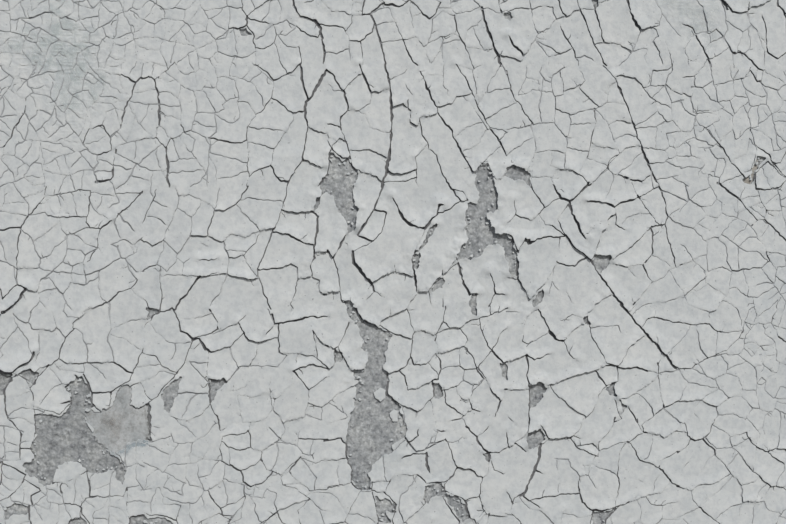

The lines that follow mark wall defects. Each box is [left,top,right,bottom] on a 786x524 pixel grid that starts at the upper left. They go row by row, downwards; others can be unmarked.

peeling [294,0,354,30]
peeling [0,328,227,524]
crack [0,0,468,524]
peeling [279,104,627,524]
crack [354,273,575,474]
crack [507,393,786,524]
crack [766,386,786,426]